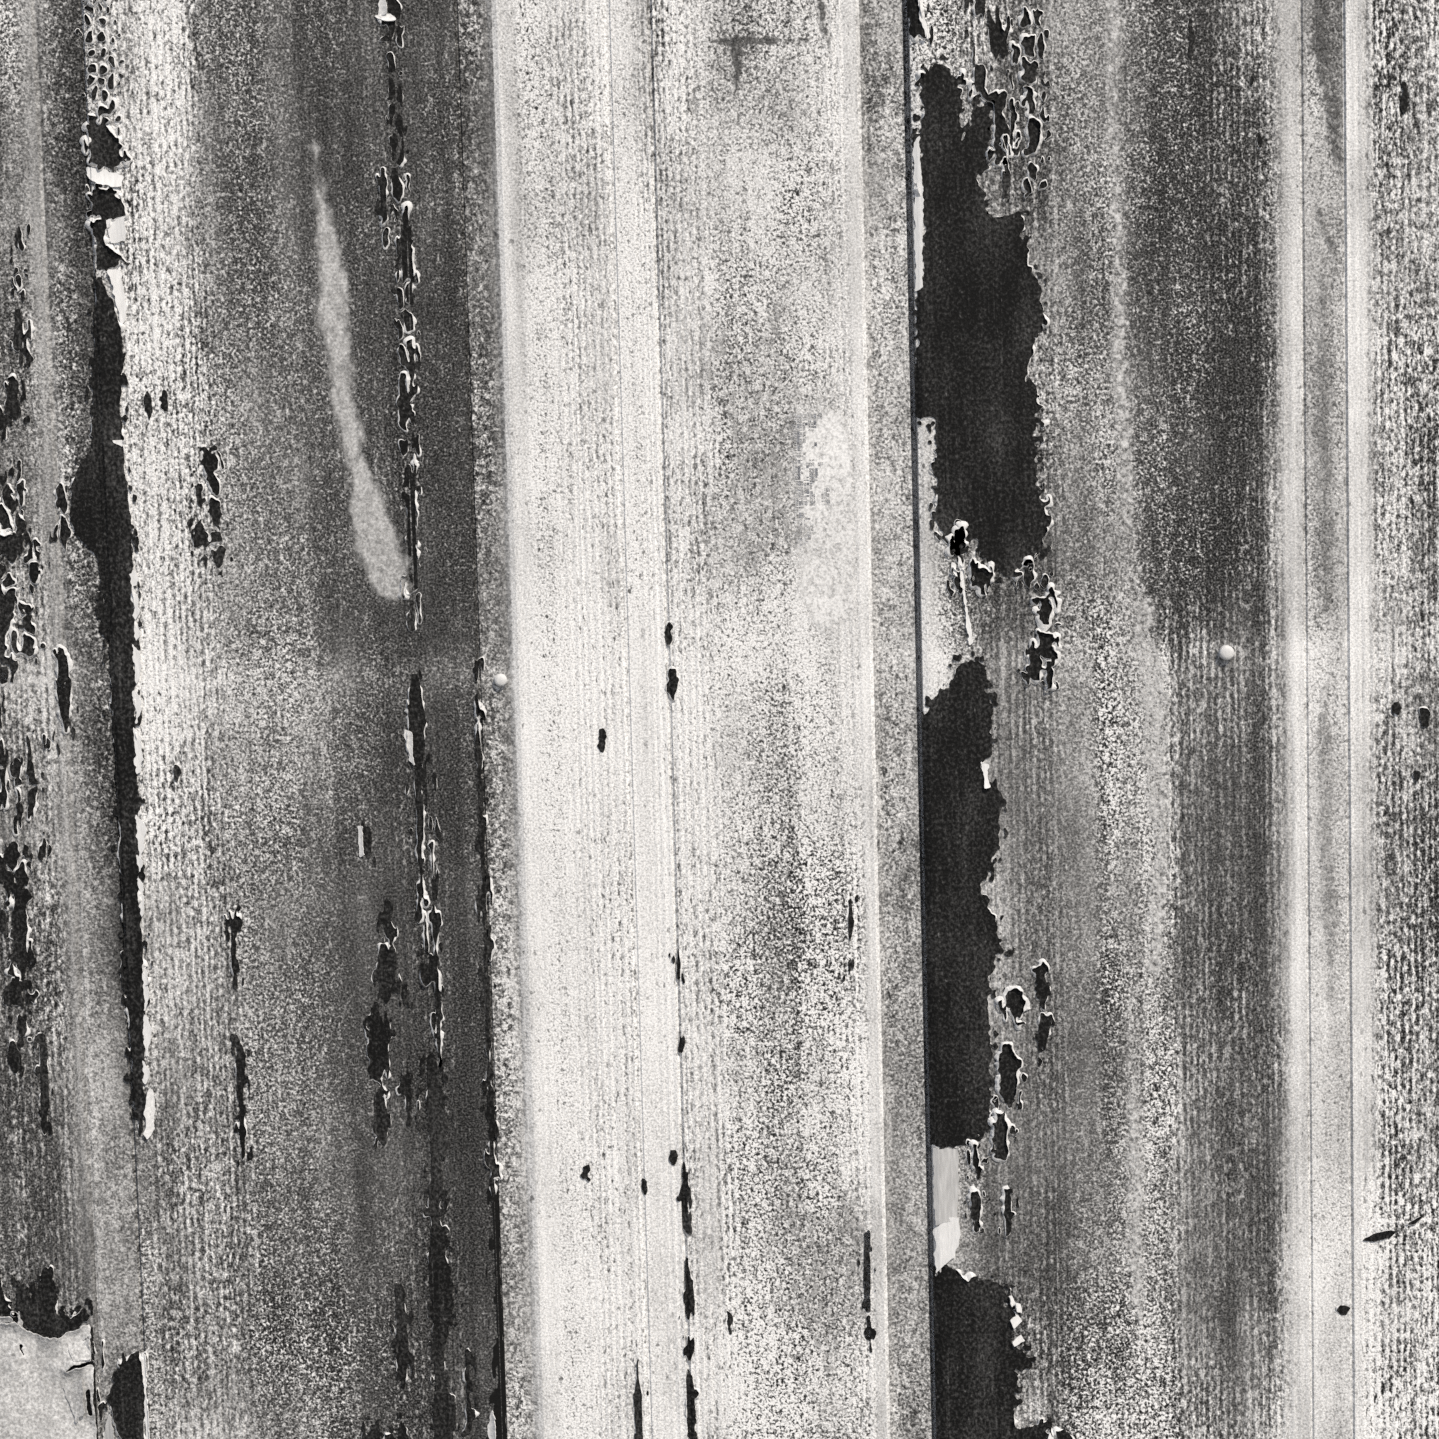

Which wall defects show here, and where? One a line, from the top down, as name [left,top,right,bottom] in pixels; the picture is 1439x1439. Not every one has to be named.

peeling [0,224,35,442]
peeling [75,0,137,324]
peeling [187,443,233,577]
damp [315,187,409,599]
damp [1105,0,1134,533]
peeling [0,459,60,1042]
peeling [910,0,1077,1439]
damp [1133,597,1173,973]
peeling [0,1257,98,1439]
peeling [361,1412,409,1439]
damp [1124,1095,1147,1339]